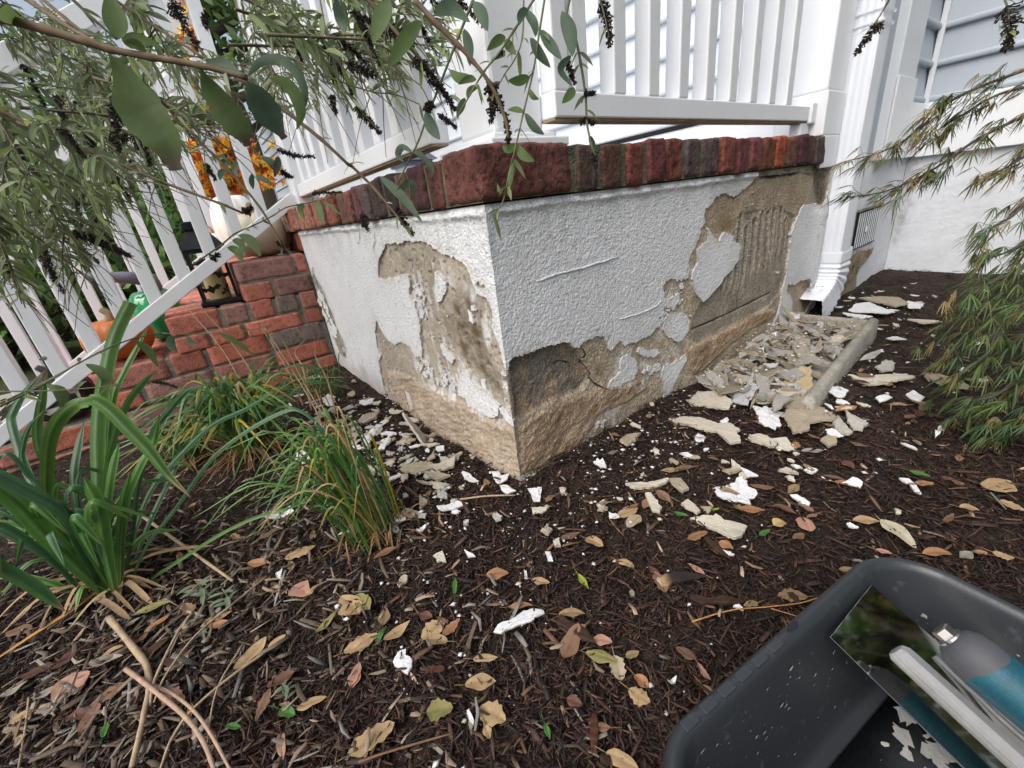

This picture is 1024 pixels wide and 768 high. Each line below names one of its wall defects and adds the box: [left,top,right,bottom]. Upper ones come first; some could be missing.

crack [553,347,609,390]
peeling [376,165,830,502]